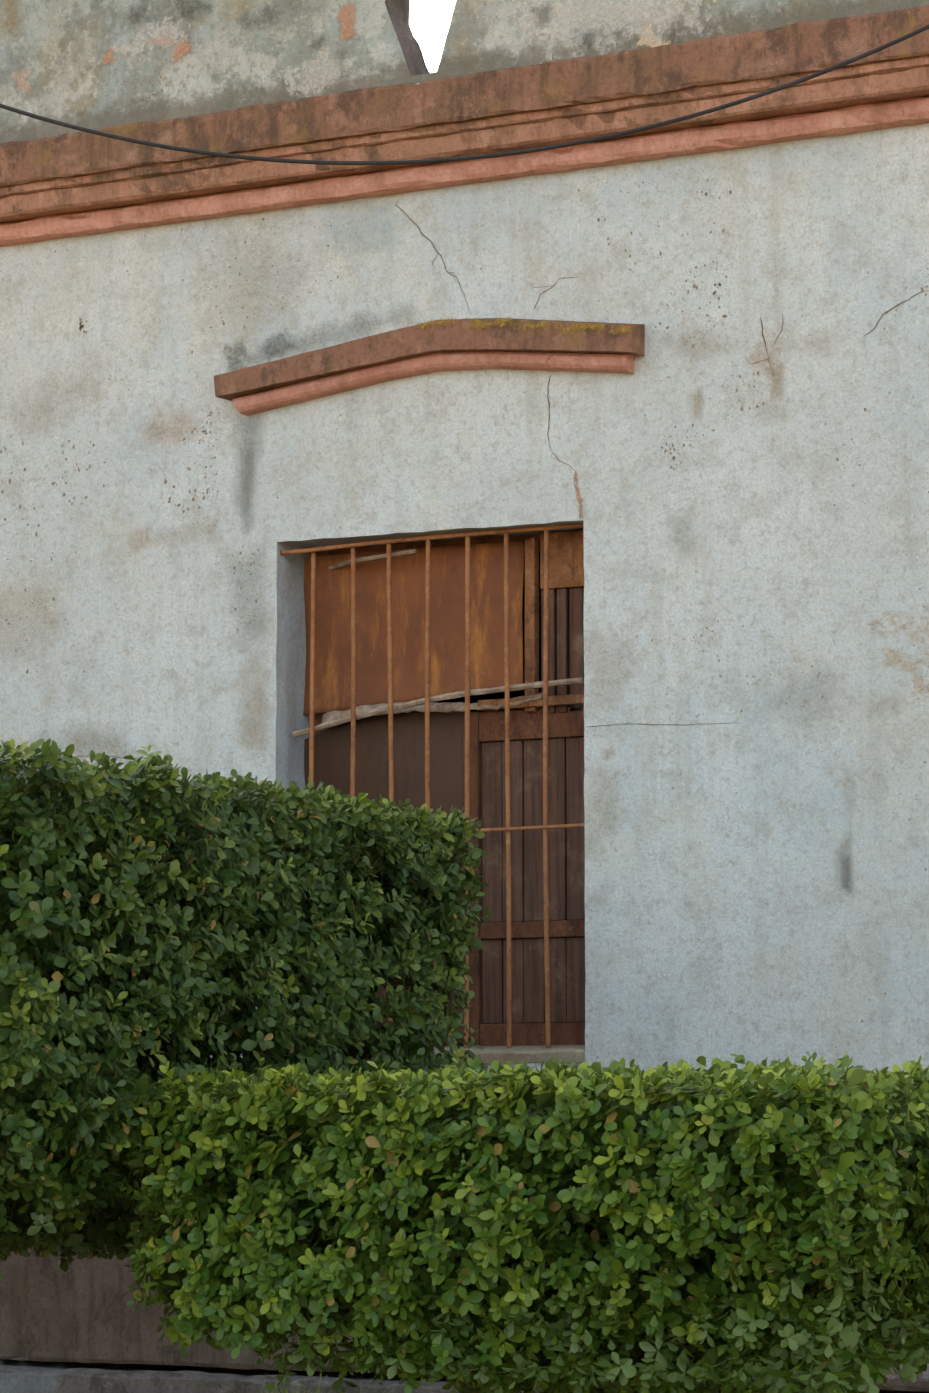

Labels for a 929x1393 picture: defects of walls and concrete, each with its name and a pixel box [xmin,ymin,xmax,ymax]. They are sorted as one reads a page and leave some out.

crack [395,204,469,309]
crack [863,274,929,338]
crack [520,277,583,518]
corrosion [303,541,525,715]